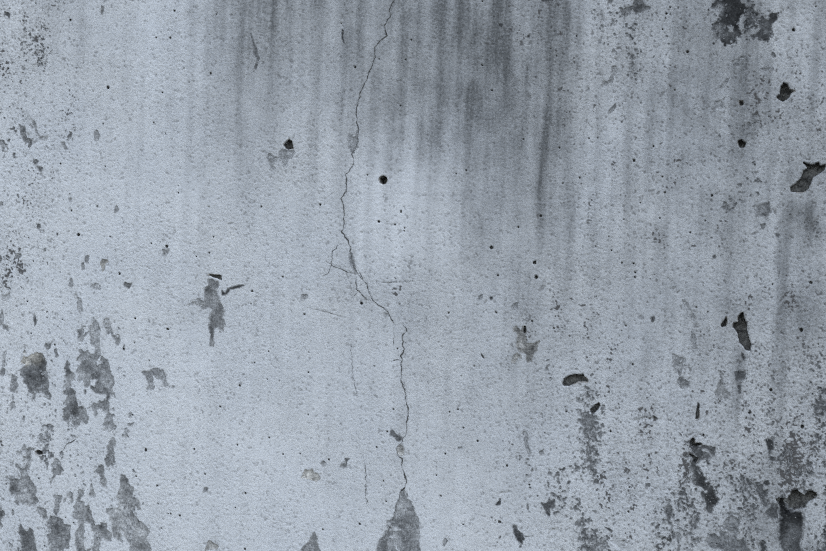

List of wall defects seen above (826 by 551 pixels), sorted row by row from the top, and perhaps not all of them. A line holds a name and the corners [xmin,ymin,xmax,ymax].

peeling [708,0,779,47]
leakage [176,0,826,384]
peeling [187,278,245,347]
crack [323,1,409,551]
peeling [0,317,152,551]
peeling [141,368,175,390]
peeling [300,532,320,551]
peeling [377,489,421,551]
peeling [541,375,631,551]
leakage [732,344,750,419]
peeling [764,404,826,551]
peeling [803,347,826,451]